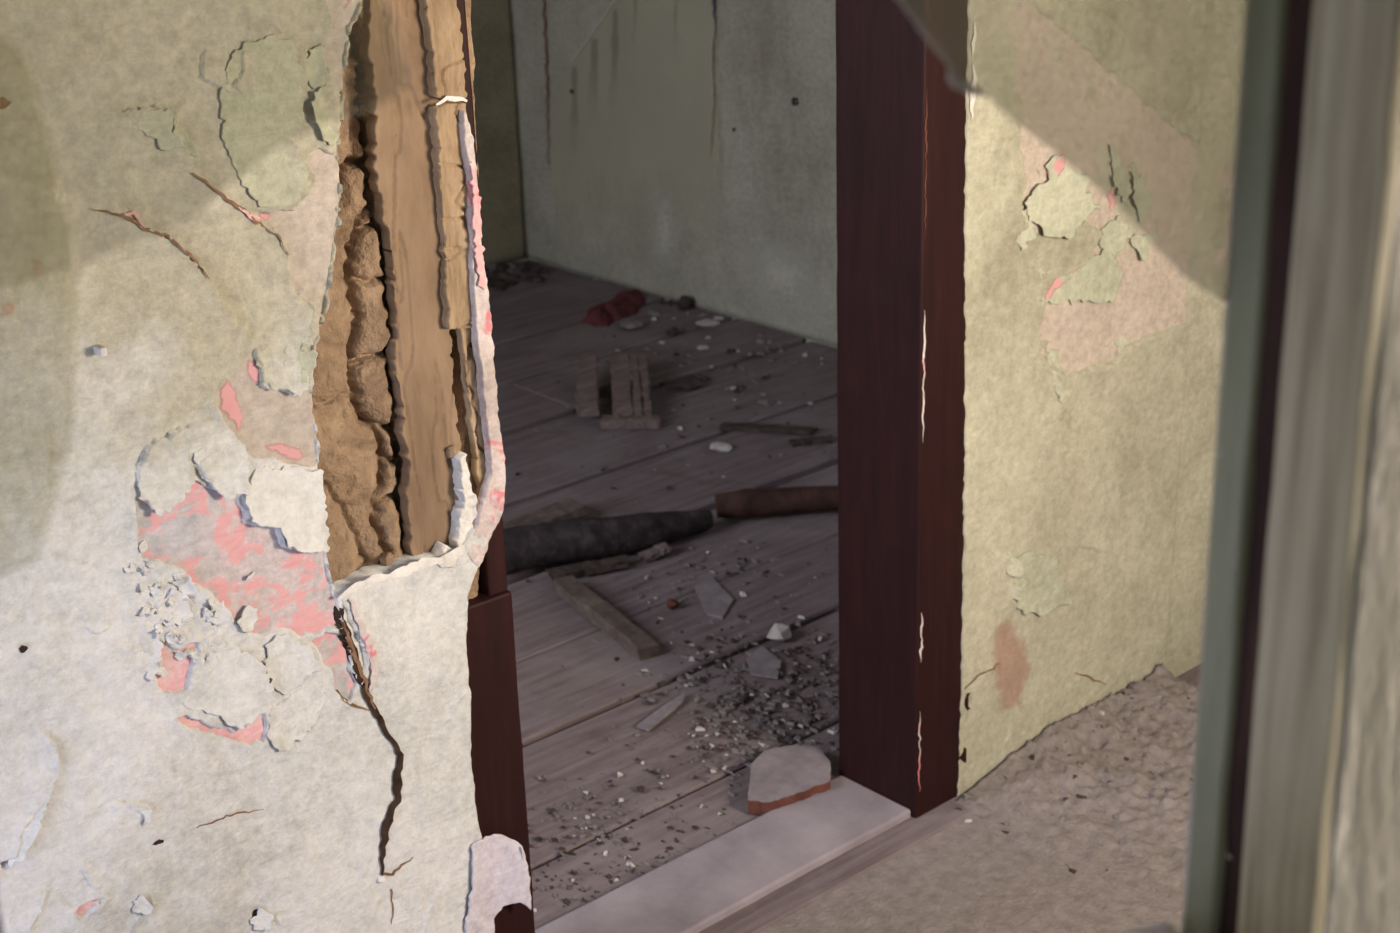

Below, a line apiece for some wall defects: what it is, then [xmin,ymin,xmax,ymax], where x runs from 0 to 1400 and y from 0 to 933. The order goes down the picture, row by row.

crack [541,0,549,168]
crack [709,0,717,157]
flaking render [122,0,506,752]
peeling [1016,126,1187,403]
crack [333,606,413,924]